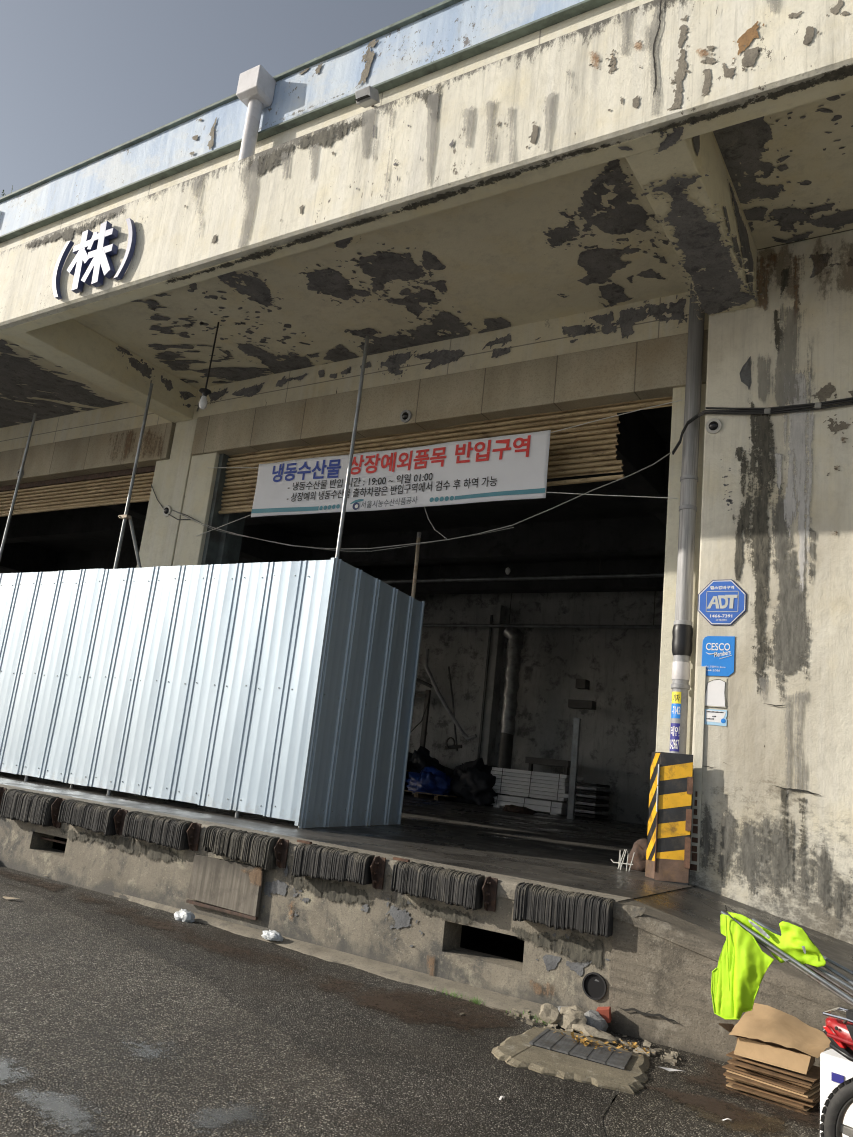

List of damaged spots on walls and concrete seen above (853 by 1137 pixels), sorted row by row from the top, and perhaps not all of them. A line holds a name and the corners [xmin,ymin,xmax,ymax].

damp [619,11,631,55]
damp [645,7,660,115]
crack [653,0,662,96]
peeling [667,15,764,111]
damp [644,64,853,135]
damp [167,83,630,283]
peeling [543,94,853,343]
damp [812,238,853,293]
peeling [116,236,512,411]
peeling [0,339,127,428]
damp [732,245,816,858]